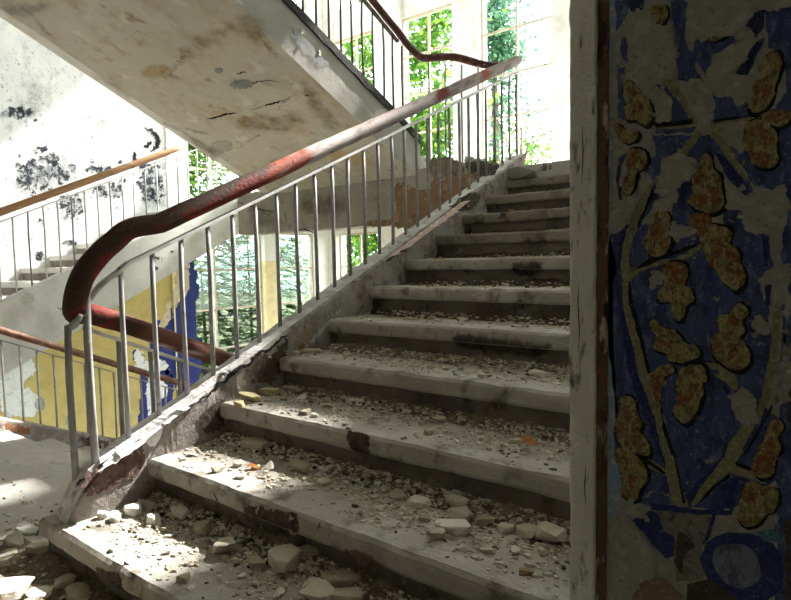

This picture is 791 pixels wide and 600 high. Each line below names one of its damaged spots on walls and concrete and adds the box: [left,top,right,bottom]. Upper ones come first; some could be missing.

crack [235,71,280,110]
peeling [620,8,679,123]
peeling [684,0,756,135]
flaking render [367,156,500,257]
peeling [654,148,697,209]
peeling [724,178,791,235]
peeling [0,359,45,417]
peeling [134,349,169,415]
crack [200,335,288,400]
spalling [79,392,205,496]
spalling [346,430,370,455]
spalling [244,503,302,541]